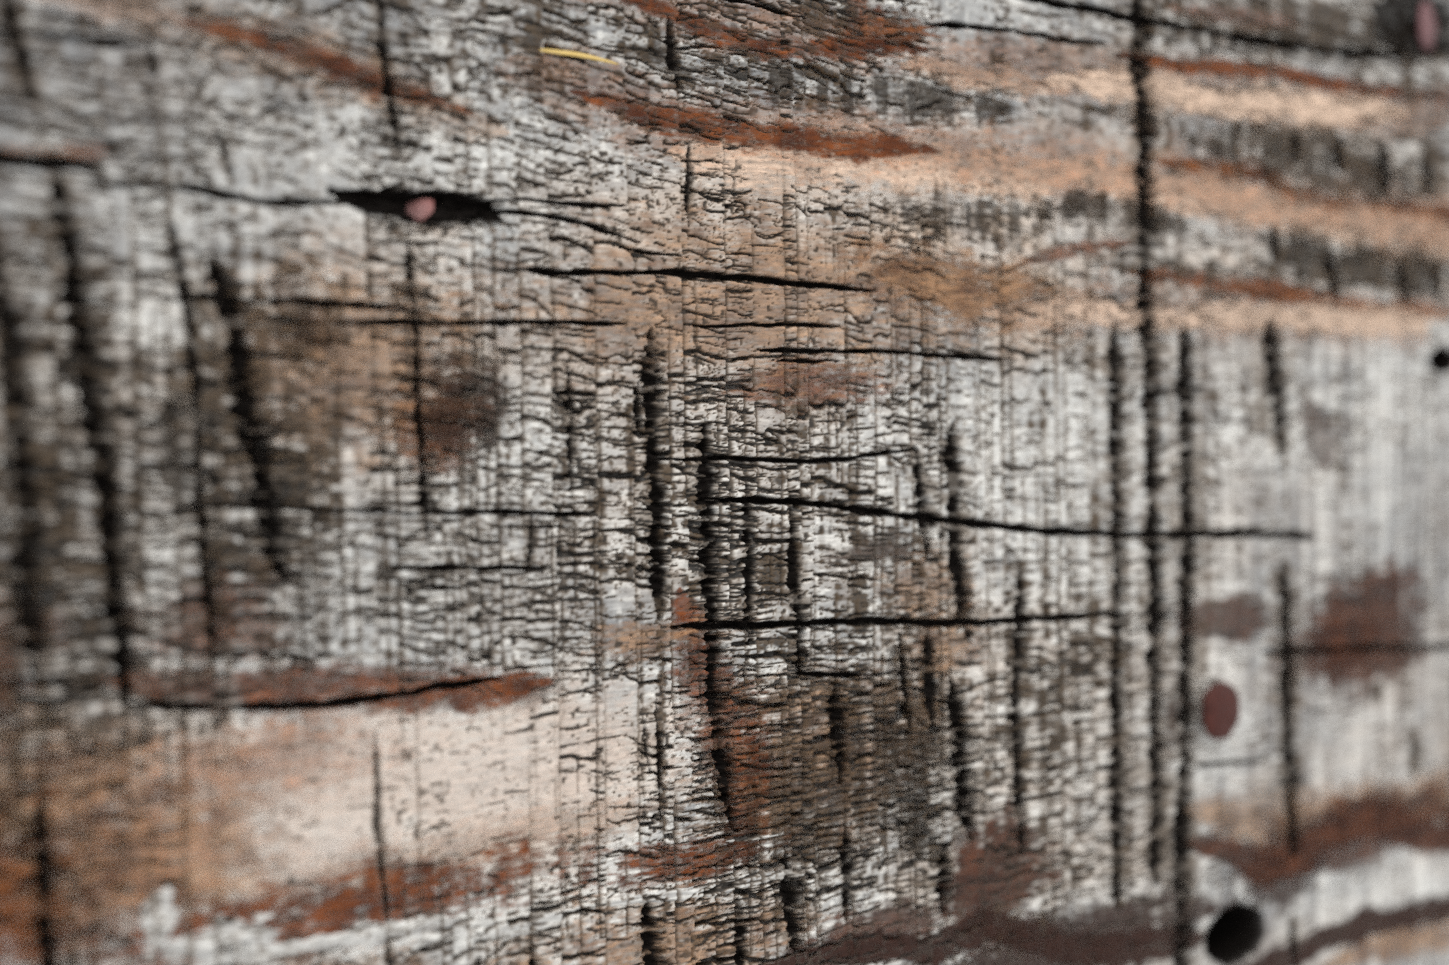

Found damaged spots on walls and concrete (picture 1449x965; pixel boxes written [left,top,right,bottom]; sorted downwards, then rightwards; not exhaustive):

crack [0,3,155,121]
crack [372,0,399,162]
rust [622,0,1449,126]
crack [495,148,872,292]
crack [0,132,623,712]
crack [632,0,1449,965]
crack [29,800,57,965]
crack [373,752,388,908]
crack [526,940,536,965]